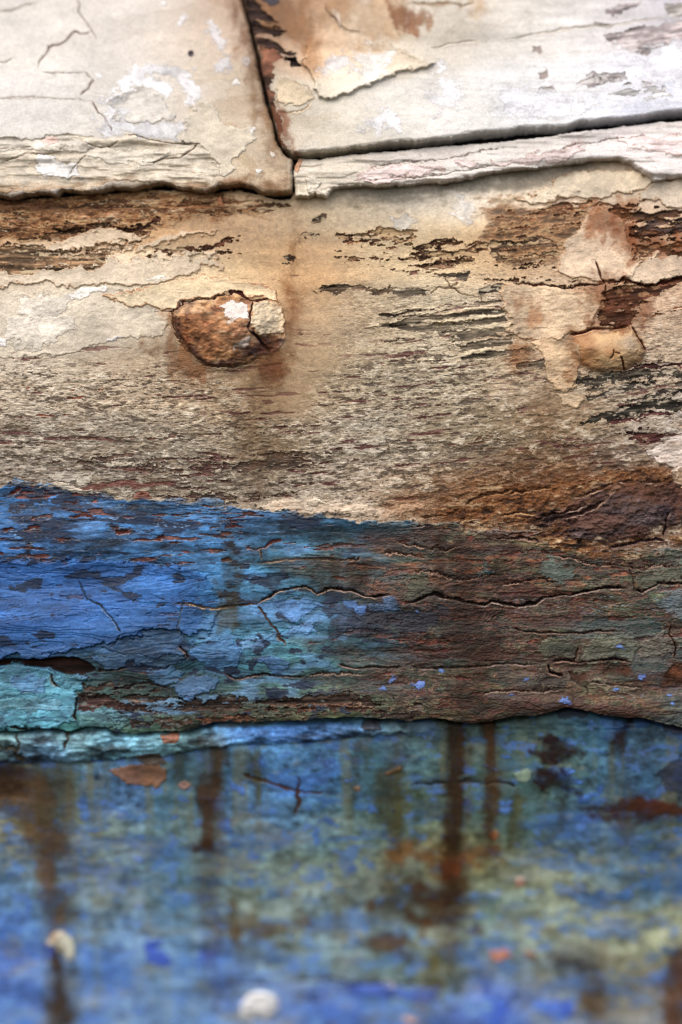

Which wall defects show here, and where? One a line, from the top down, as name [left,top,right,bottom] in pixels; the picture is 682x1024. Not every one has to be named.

crack [0,0,200,173]
peeling [496,0,682,122]
peeling [0,63,291,362]
crack [355,148,498,181]
peeling [313,139,682,488]
crack [49,674,78,749]
crack [79,581,168,690]
crack [115,530,167,542]
peeling [0,556,449,789]
crack [174,481,682,695]
peeling [524,626,672,719]
peeling [630,561,682,622]